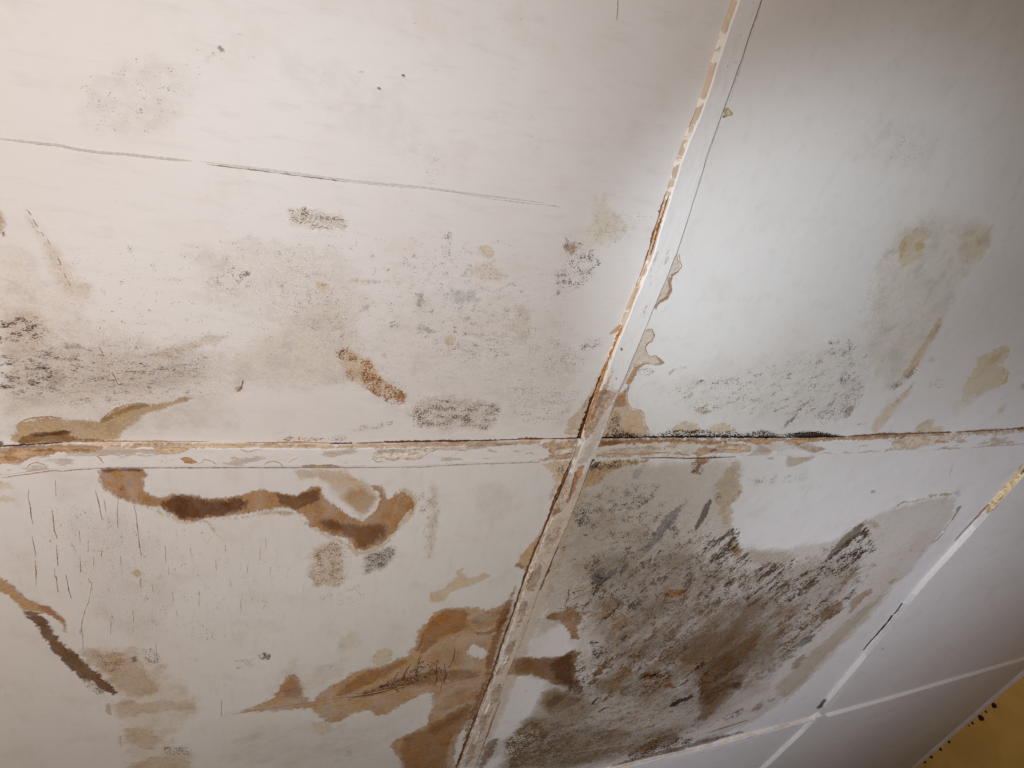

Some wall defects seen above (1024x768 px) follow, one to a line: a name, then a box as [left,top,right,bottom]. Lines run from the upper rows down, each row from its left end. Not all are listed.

mould [0,314,220,420]
water stain [274,207,600,431]
water stain [601,329,1024,439]
peeling [0,445,352,469]
peeling [368,378,1024,560]
water stain [52,639,124,695]
water stain [503,482,876,768]